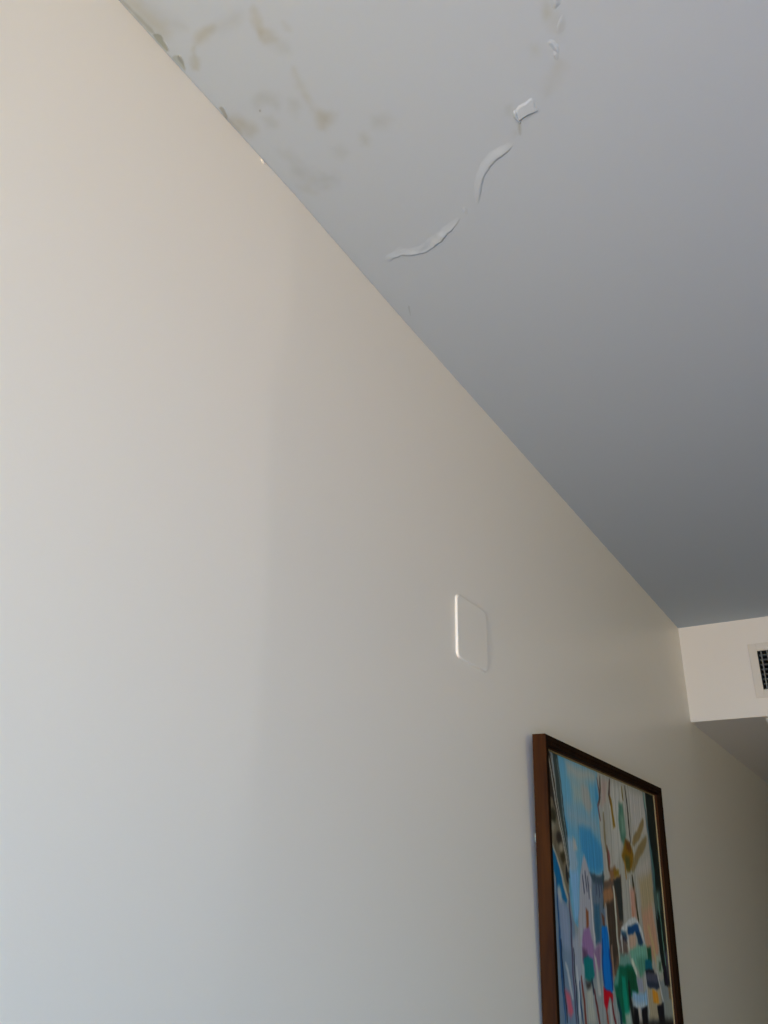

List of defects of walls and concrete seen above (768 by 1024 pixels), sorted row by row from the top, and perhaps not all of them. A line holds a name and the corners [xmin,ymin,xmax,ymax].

water stain [119,0,401,199]
peeling [513,98,541,137]